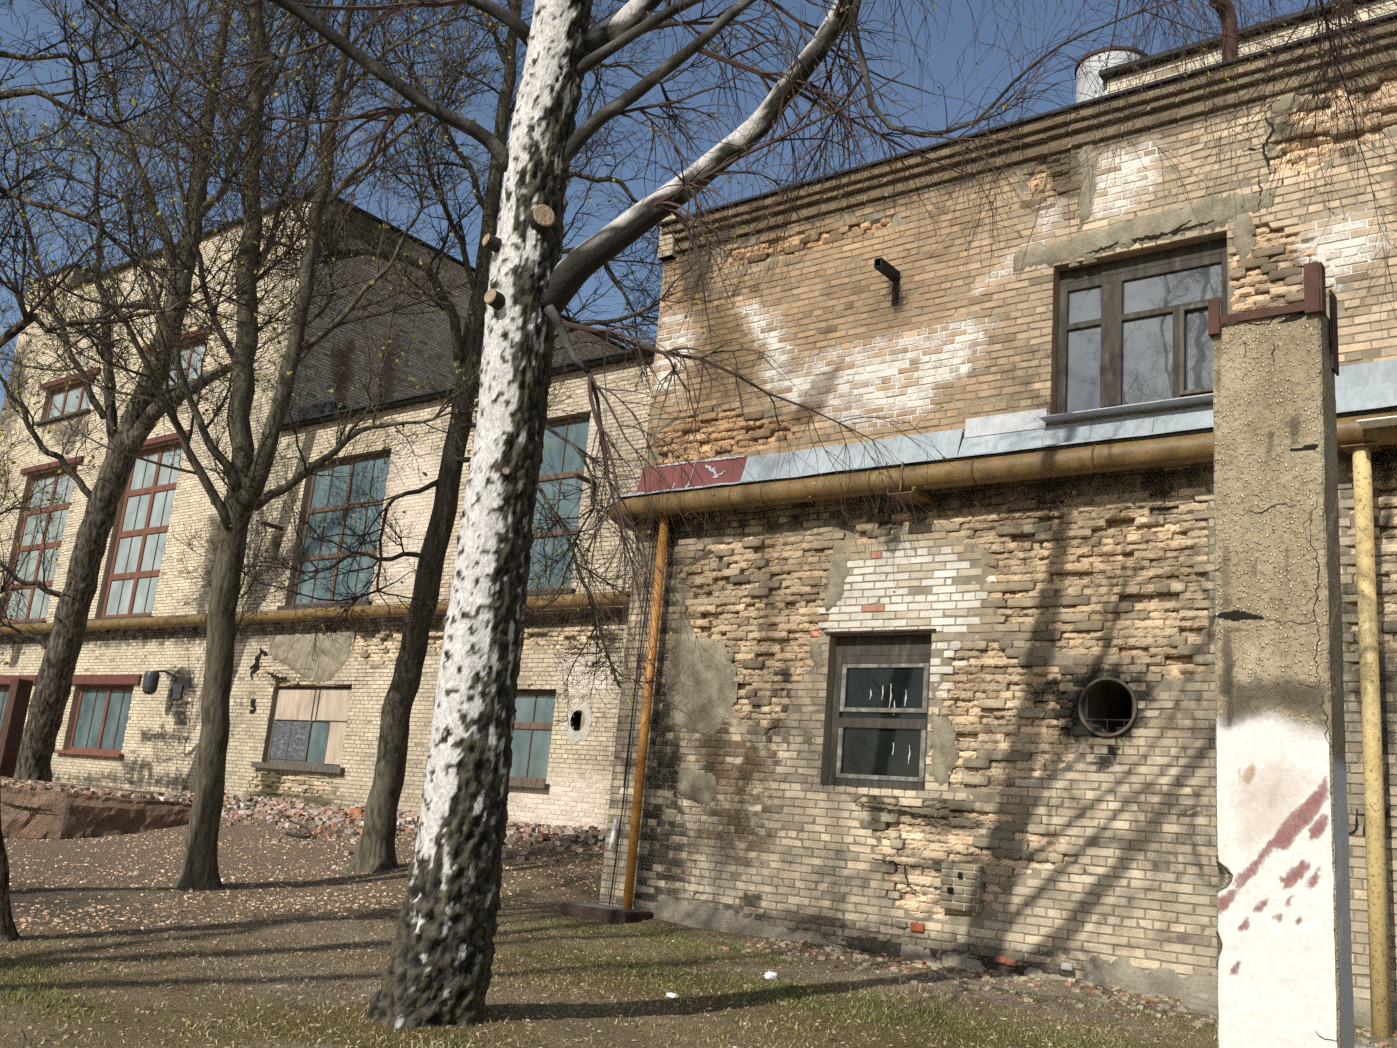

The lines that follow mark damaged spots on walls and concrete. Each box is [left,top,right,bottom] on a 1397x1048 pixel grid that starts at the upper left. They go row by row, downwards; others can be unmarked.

spalling [1270,66,1397,175]
spalling [1009,151,1082,213]
leakage [653,245,711,401]
leakage [734,297,994,433]
leakage [884,281,904,311]
spalling [1229,227,1334,324]
leakage [1035,469,1171,532]
crack [1237,499,1334,757]
leakage [633,505,820,902]
spalling [668,482,1265,981]
leakage [1031,677,1059,702]
leakage [1087,745,1120,772]